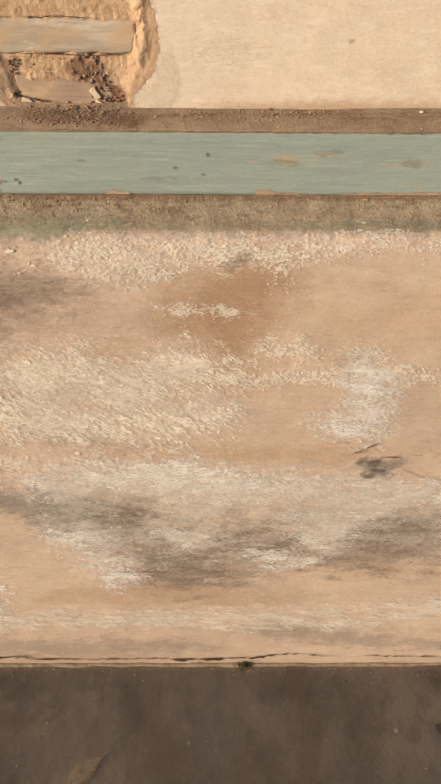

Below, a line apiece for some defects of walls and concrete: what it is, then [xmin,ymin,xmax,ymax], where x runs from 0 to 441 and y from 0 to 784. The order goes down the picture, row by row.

spalling [0,0,159,107]
leakage [33,487,441,598]
crack [0,654,315,662]